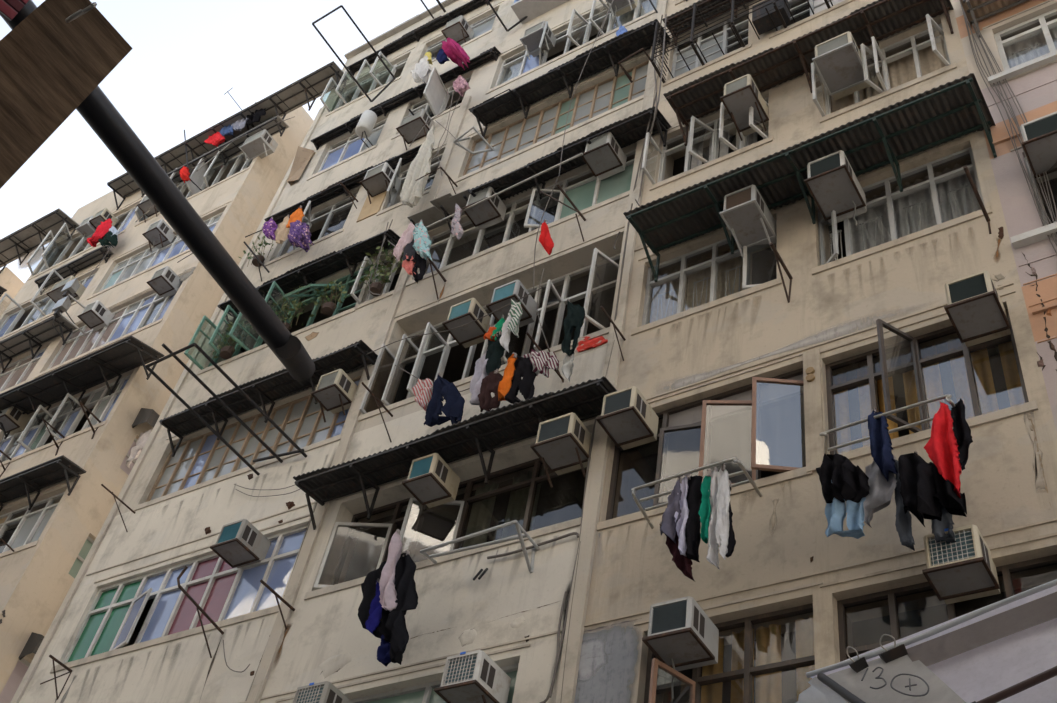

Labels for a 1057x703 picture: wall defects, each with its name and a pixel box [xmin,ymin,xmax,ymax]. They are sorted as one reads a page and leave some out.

crack [1022,253,1057,371]